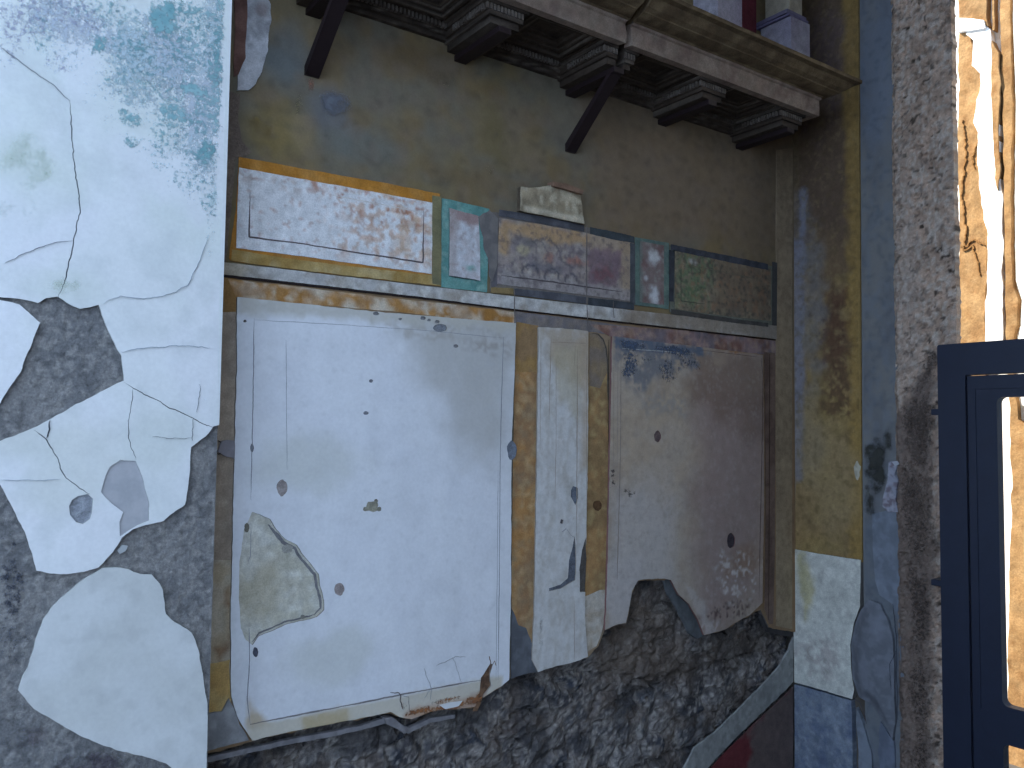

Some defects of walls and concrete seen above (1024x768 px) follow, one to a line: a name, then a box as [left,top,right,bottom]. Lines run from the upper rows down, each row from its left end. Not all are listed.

crack [1,47,81,299]
crack [960,120,985,276]
crack [106,240,208,302]
spalling [0,297,123,441]
crack [125,344,205,352]
crack [9,421,87,493]
crack [128,384,221,456]
water stain [865,432,891,513]
spalling [0,425,787,768]
rust [405,694,482,716]